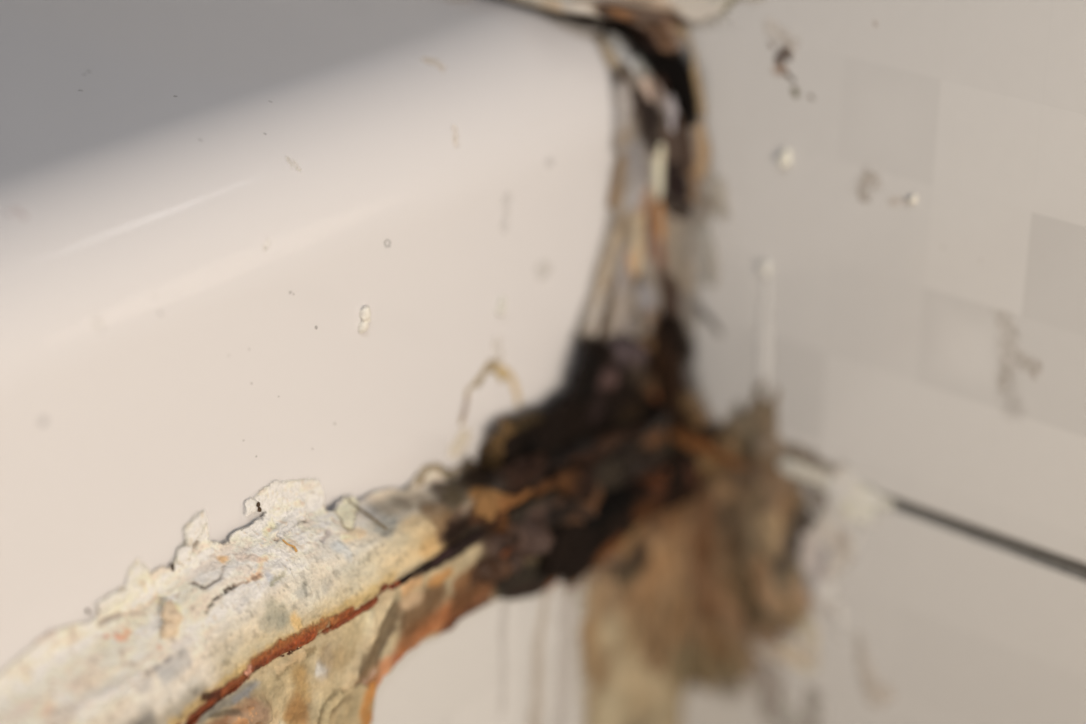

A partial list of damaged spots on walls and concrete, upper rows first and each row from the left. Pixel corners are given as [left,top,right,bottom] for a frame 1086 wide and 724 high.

damp [769,39,813,99]
peeling [245,498,258,516]
peeling [335,497,359,528]
damp [455,314,836,724]
peeling [318,680,377,724]